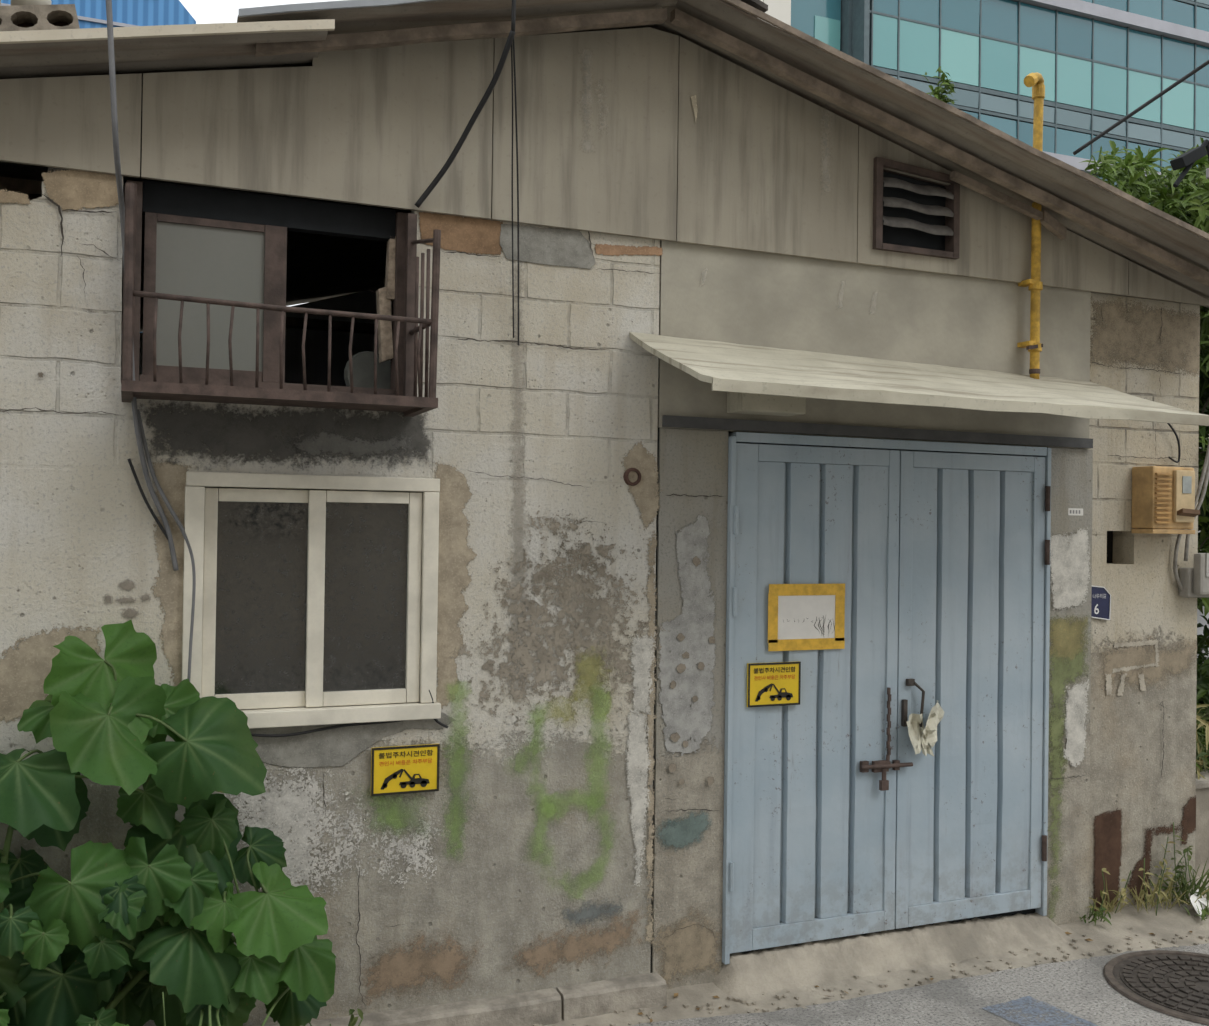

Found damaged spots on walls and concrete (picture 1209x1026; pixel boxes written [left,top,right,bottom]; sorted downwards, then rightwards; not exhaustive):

spalling [0,188,30,205]
spalling [41,167,119,211]
water stain [139,401,431,470]
peeling [1050,527,1093,612]
peeling [445,496,716,756]
peeling [0,624,102,724]
peeling [1063,679,1089,767]
rust [1092,795,1196,912]